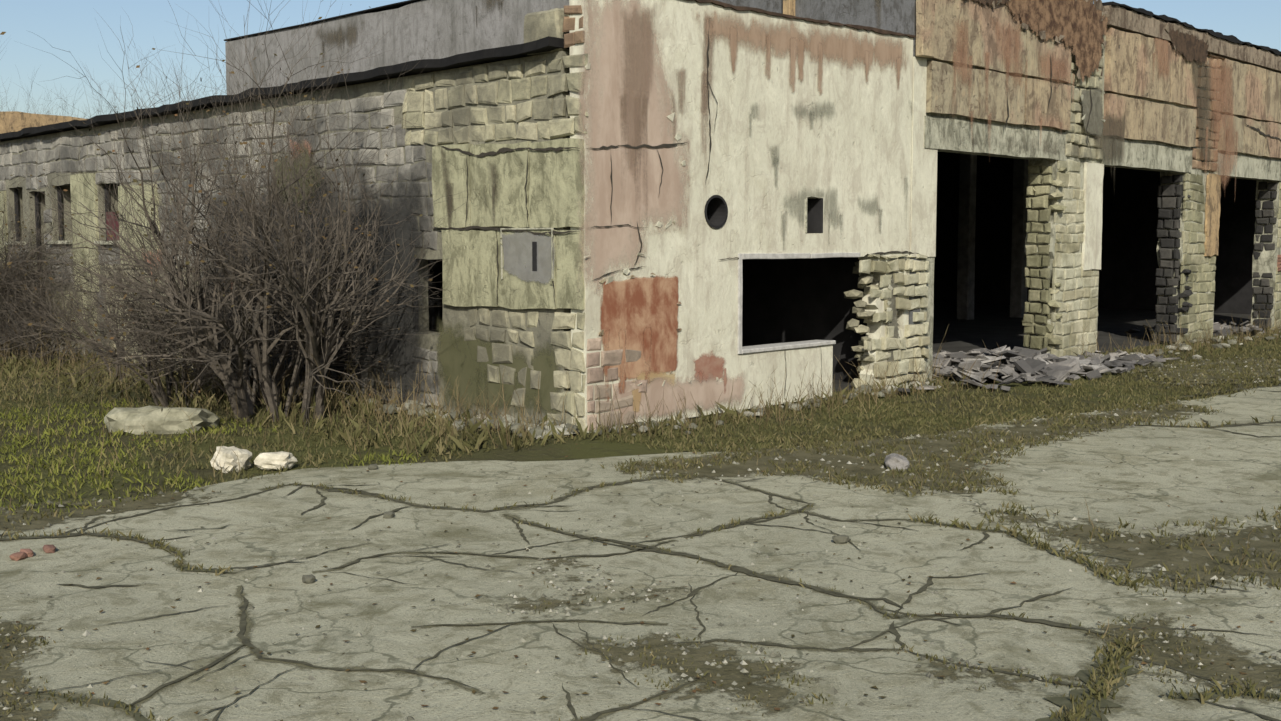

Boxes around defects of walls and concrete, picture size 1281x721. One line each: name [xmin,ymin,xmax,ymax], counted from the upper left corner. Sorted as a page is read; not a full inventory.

rust [705,12,903,94]
spalling [970,0,1108,136]
spalling [1165,22,1209,65]
crack [437,16,718,309]
peeling [580,0,689,285]
crack [873,249,919,257]
spalling [859,254,930,386]
peeling [611,376,744,423]
crack [0,475,1281,721]